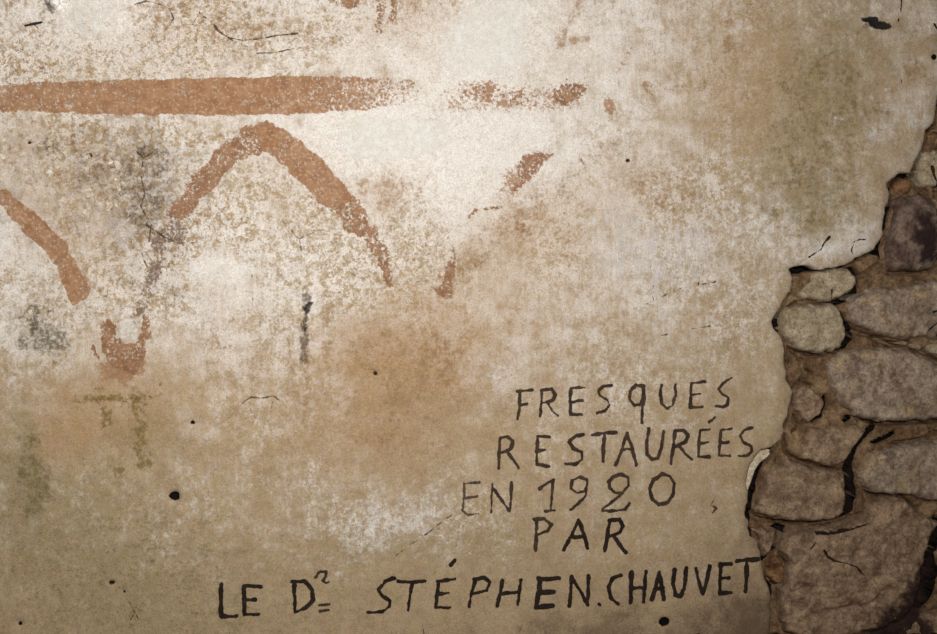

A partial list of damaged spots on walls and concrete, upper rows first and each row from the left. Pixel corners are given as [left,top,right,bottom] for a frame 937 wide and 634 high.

spalling [745,103,937,634]